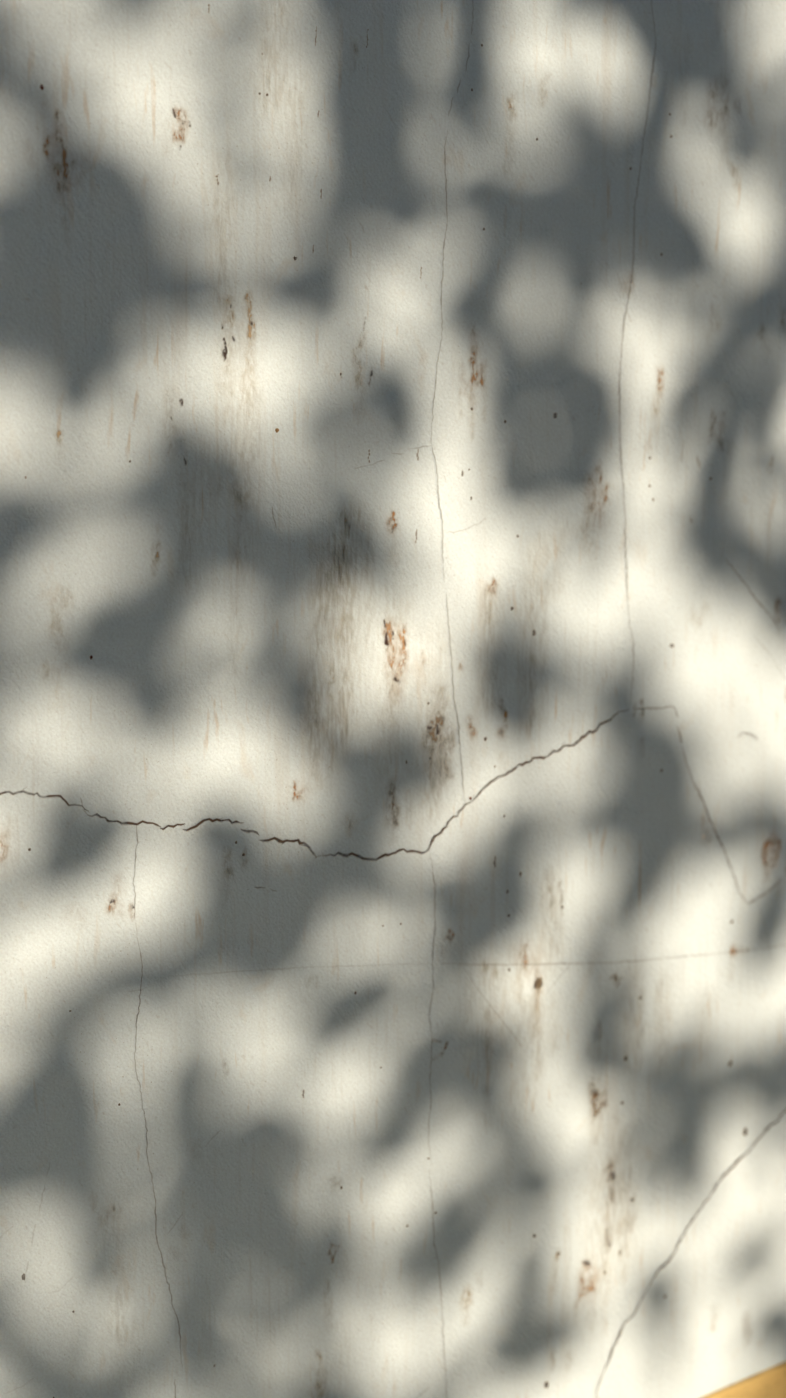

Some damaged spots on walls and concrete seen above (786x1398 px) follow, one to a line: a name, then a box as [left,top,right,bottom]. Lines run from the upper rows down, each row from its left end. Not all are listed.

corrosion [222,294,252,359]
corrosion [384,620,407,681]
crack [0,710,627,860]
crack [655,1110,786,1276]
crack [601,1315,633,1378]